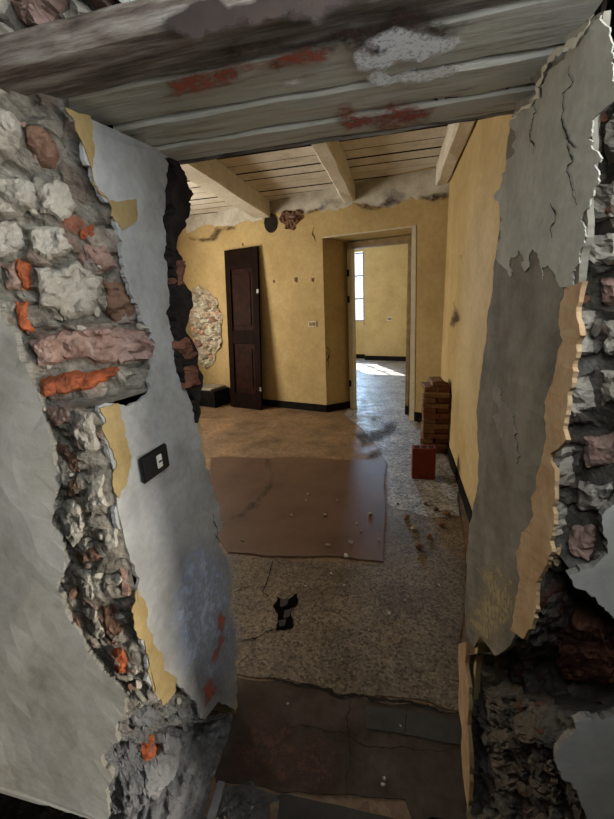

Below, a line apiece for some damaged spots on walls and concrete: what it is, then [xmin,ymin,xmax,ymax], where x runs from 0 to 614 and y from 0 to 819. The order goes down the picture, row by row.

spalling [0,0,121,35]
spalling [0,89,233,819]
flaking render [279,209,304,230]
spalling [458,0,614,819]